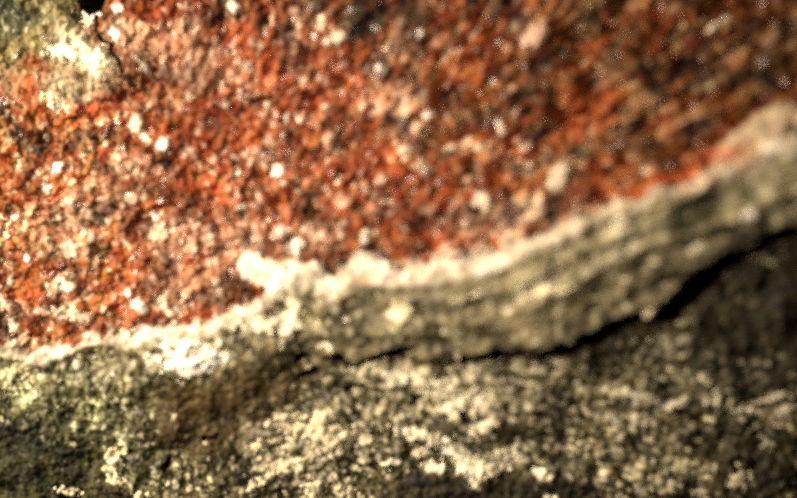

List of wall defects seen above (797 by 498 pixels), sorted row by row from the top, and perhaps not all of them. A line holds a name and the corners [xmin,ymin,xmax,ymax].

corrosion [20,74,49,119]
corrosion [657,163,701,181]
crack [444,222,797,366]